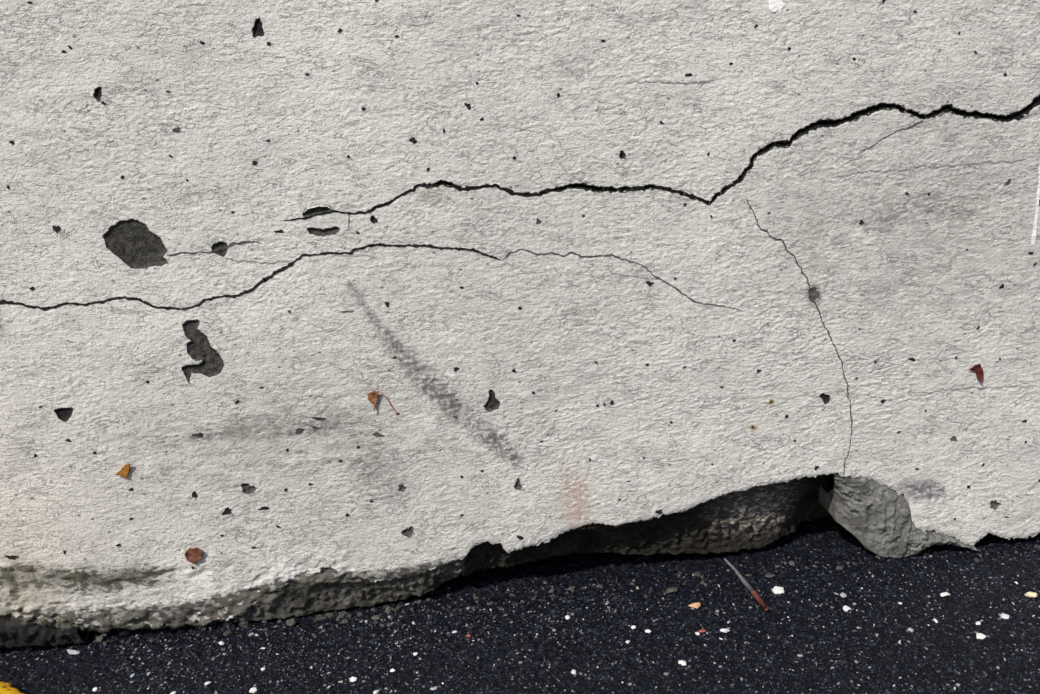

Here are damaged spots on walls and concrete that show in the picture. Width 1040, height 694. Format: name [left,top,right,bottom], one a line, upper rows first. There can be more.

peeling [103,219,168,268]
peeling [182,320,224,383]
crack [0,94,1040,477]
spalling [0,466,978,648]